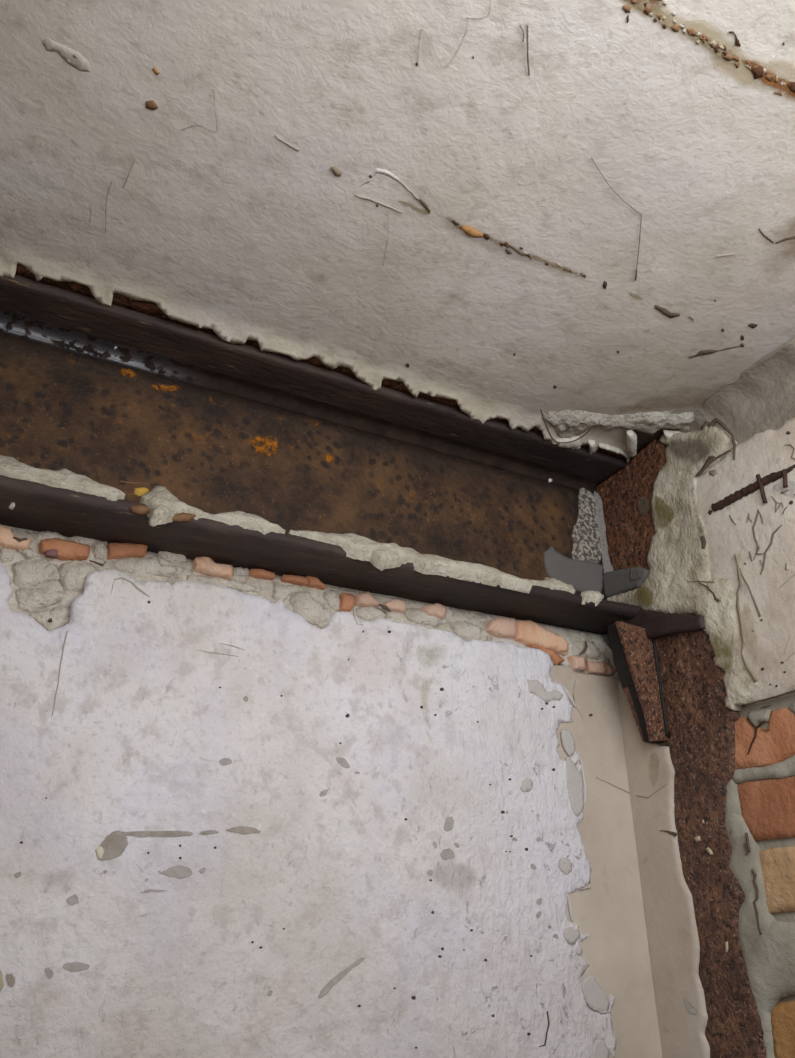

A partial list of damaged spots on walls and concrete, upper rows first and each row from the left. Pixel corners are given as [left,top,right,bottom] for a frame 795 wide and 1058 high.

crack [622,0,795,96]
corrosion [251,436,277,456]
crack [695,418,736,477]
corrosion [172,512,196,522]
peeling [0,524,710,1058]